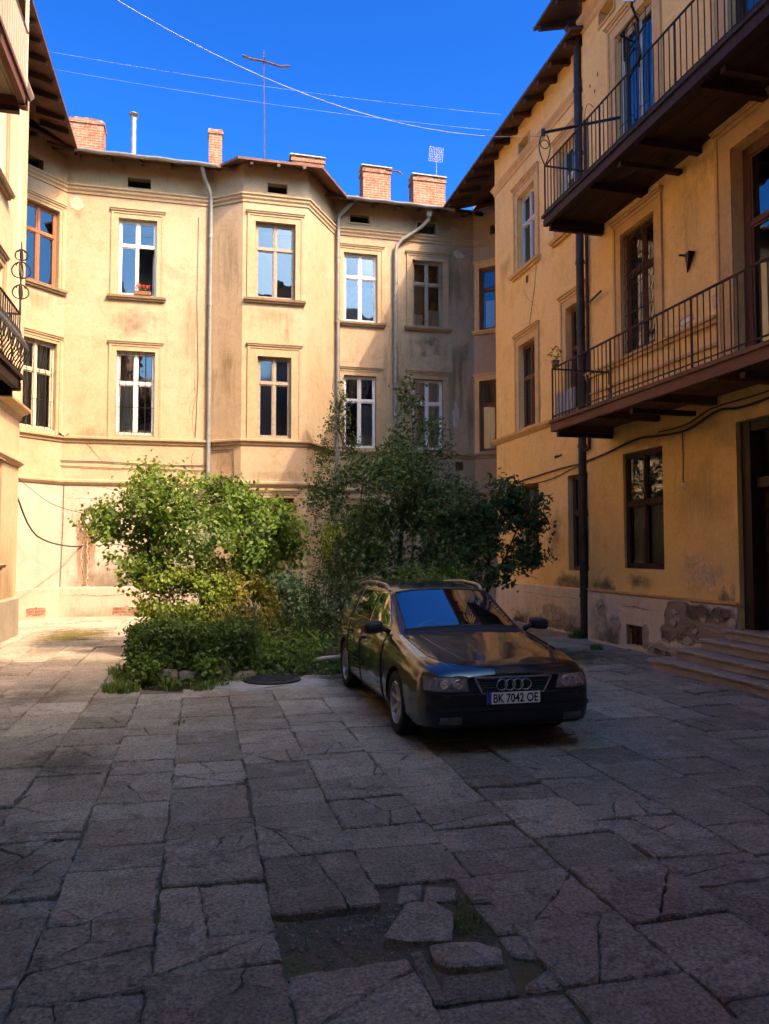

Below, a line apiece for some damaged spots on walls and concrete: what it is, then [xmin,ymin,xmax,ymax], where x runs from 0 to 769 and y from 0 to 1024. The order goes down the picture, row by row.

spalling [642,599,738,657]